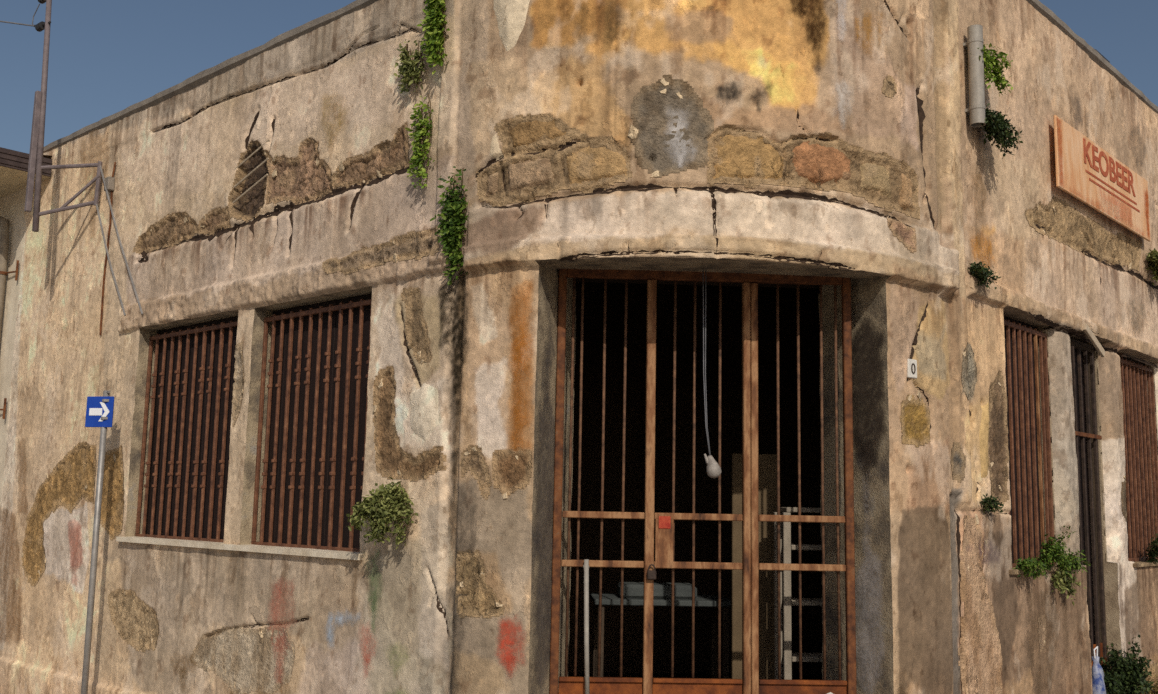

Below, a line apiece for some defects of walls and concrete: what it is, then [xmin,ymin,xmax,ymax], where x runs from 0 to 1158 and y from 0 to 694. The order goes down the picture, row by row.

water stain [718,83,740,99]
spalling [133,122,411,254]
flaking render [476,75,920,253]
crack [475,86,935,270]
crack [1082,244,1158,290]
spalling [372,366,532,500]
water stain [852,320,885,484]
crack [907,299,931,429]
crack [1029,312,1158,368]
spalling [21,441,124,586]
spalling [107,589,159,652]
flaking render [190,624,295,694]